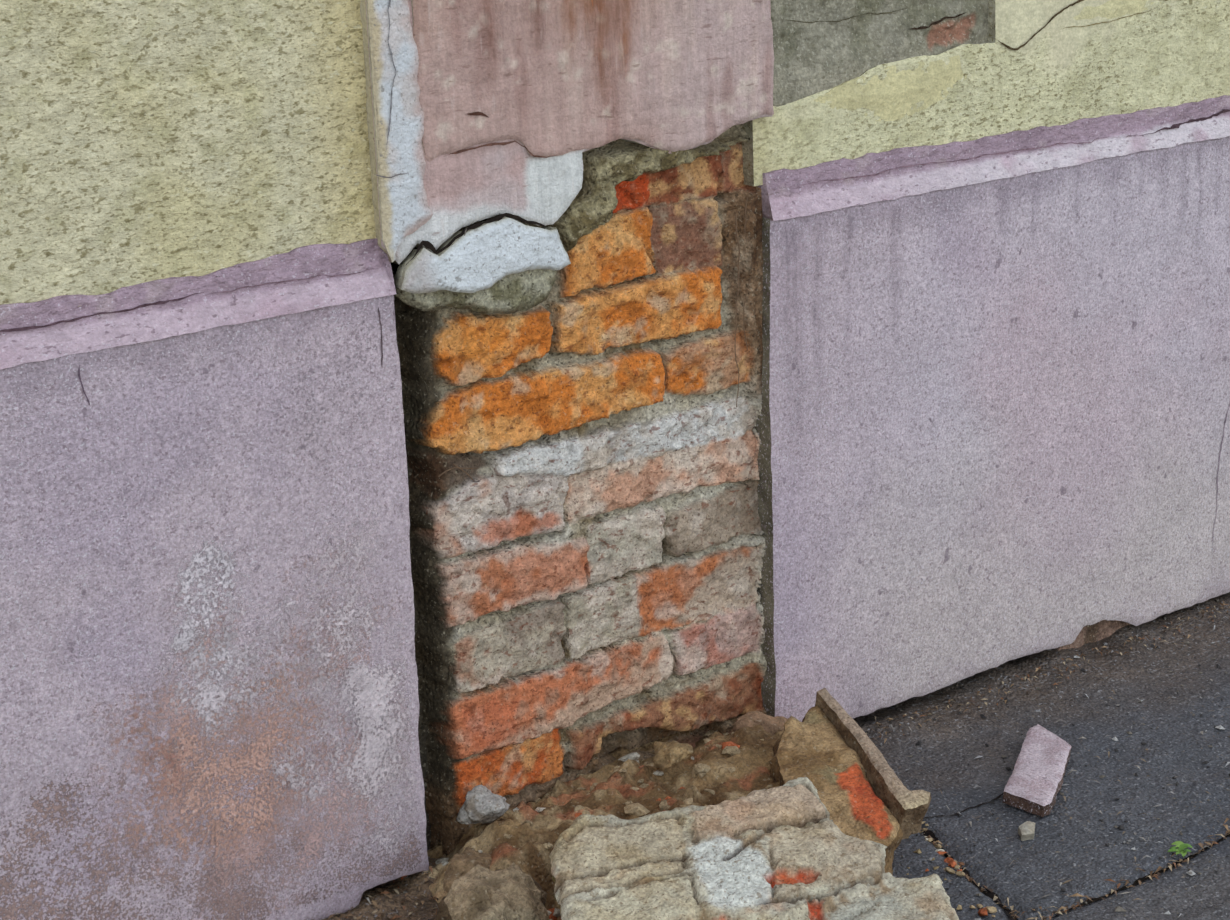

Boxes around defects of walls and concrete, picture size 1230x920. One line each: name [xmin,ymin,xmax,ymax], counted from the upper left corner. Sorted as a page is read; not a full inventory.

crack [999,0,1167,51]
crack [800,109,1230,185]
crack [406,213,548,265]
crack [0,268,373,332]
spalling [391,0,989,856]
crack [1213,404,1230,531]
damp [0,515,421,920]